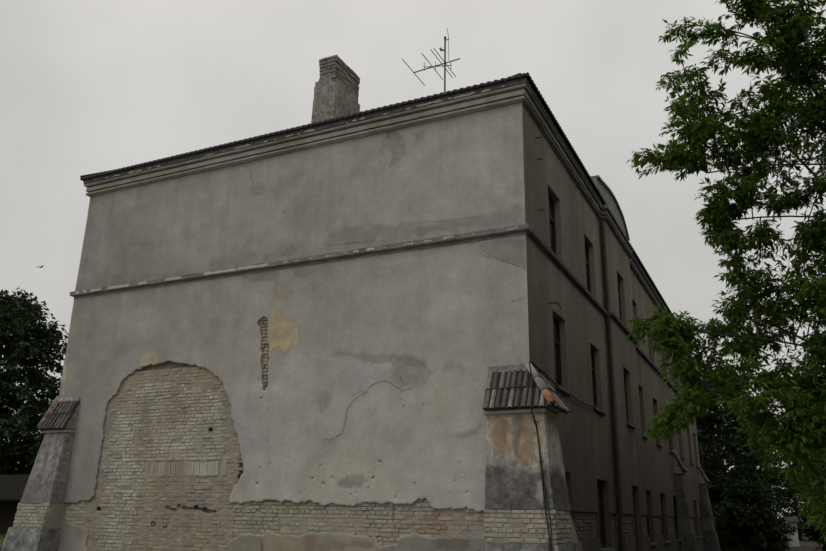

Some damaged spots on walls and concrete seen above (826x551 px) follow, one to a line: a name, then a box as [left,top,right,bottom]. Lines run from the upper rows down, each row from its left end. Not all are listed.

peeling [258,308,299,399]
flaking render [63,349,596,551]